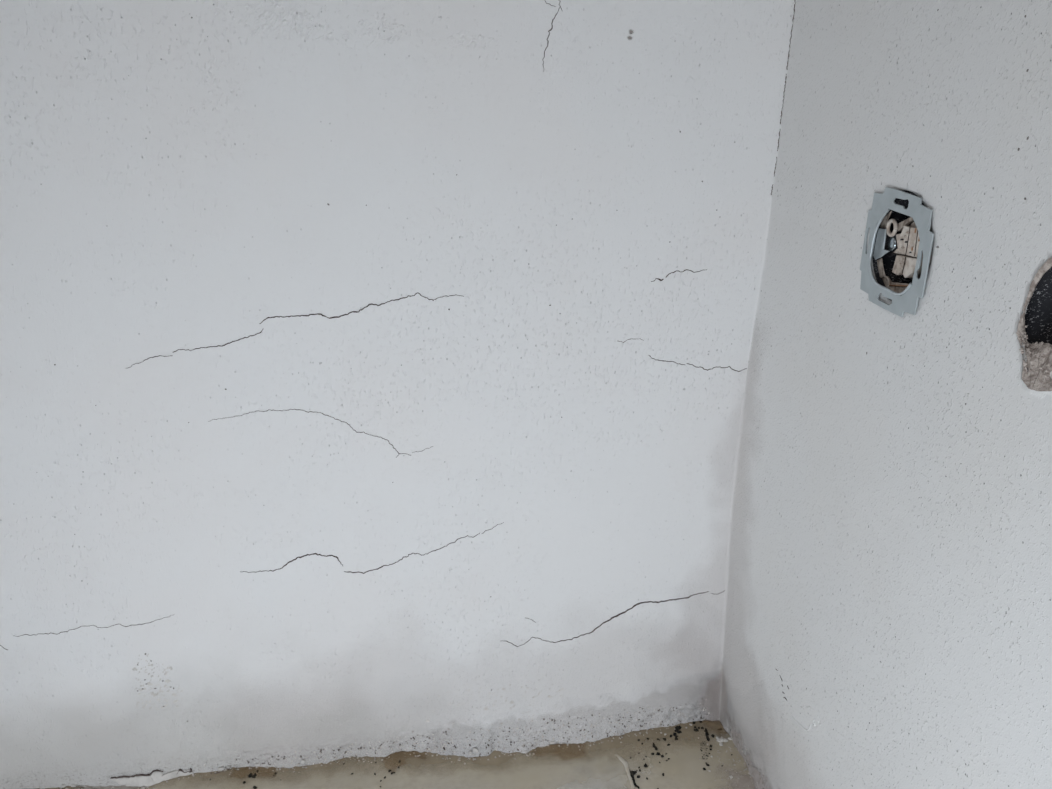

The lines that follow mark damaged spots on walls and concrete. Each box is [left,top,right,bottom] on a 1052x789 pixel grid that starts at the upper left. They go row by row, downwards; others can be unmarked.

crack [542,0,563,68]
crack [129,293,464,368]
crack [619,339,747,372]
crack [212,409,433,455]
crack [243,522,504,574]
crack [0,615,171,650]
crack [507,590,725,647]
damp [134,698,764,789]